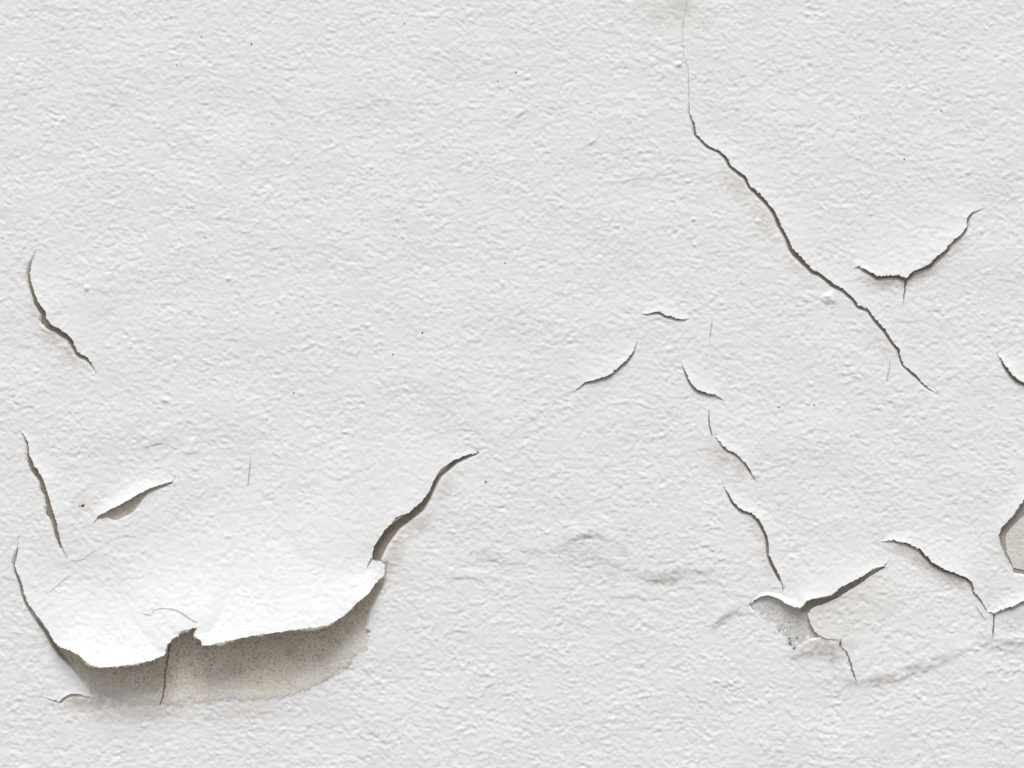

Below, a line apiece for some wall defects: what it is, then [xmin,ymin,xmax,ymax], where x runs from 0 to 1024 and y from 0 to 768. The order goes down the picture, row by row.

crack [682,2,938,395]
peeling [13,429,477,705]
crack [708,411,763,482]
peeling [722,475,1024,681]